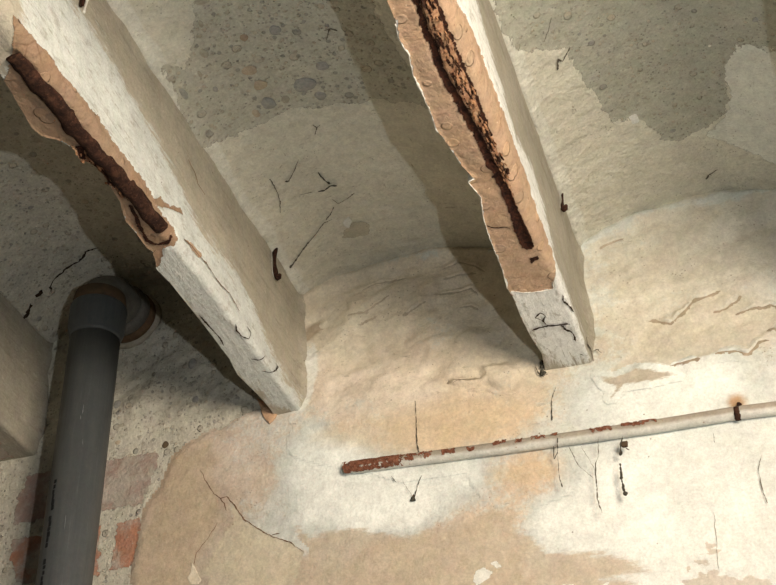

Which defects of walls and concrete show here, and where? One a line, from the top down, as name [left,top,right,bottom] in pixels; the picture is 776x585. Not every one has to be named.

flaking render [161,0,556,303]
flaking render [0,15,277,585]
damp [130,428,235,585]
rust [342,448,455,473]
damp [287,376,567,468]
damp [364,445,587,510]
rust [492,432,558,446]
rust [589,418,657,433]
rust [718,385,758,409]